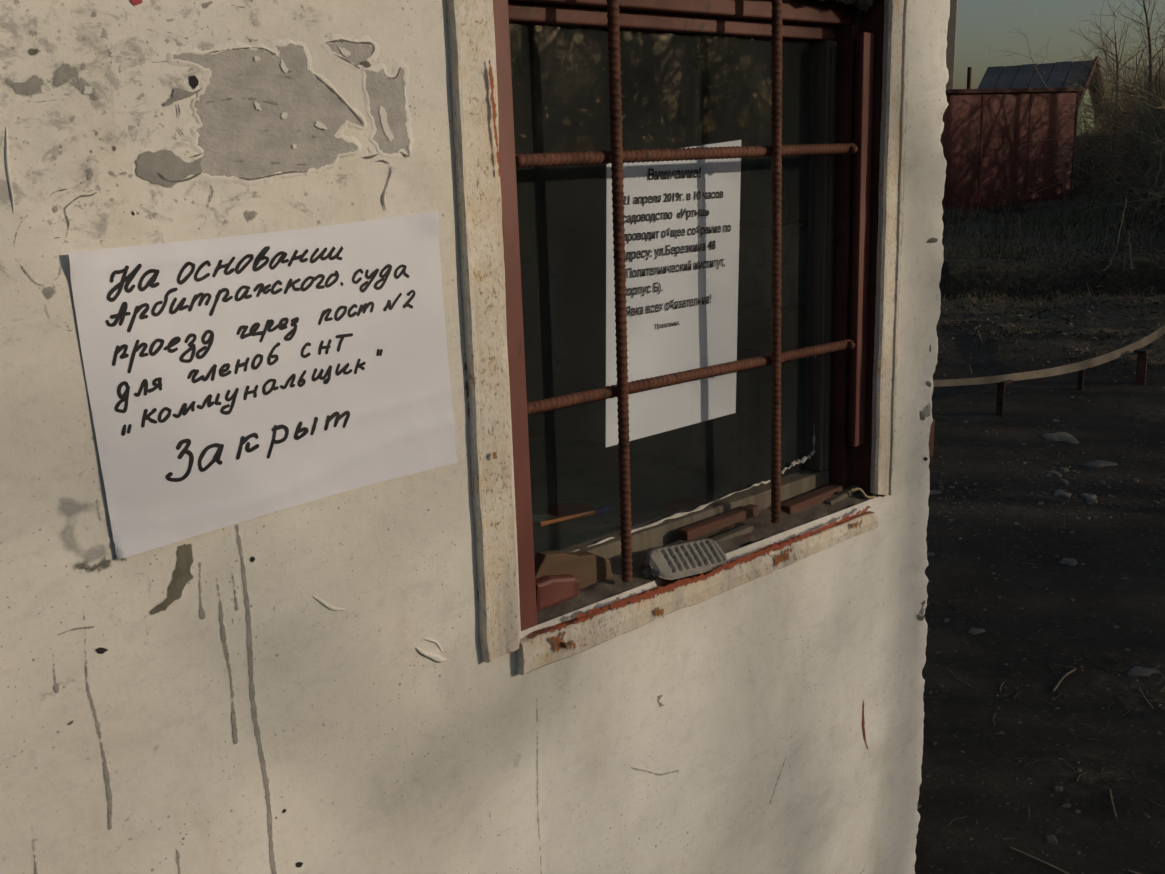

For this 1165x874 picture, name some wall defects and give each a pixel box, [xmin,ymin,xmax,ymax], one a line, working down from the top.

flaking render [136,34,414,211]
corrosion [527,506,874,653]
water stain [145,525,277,874]